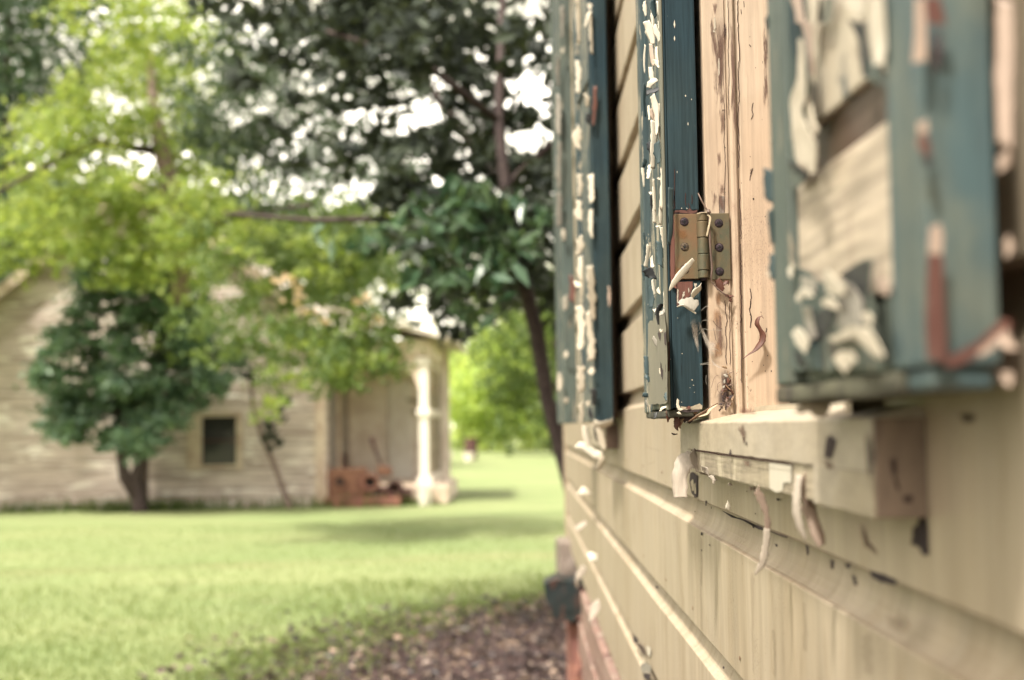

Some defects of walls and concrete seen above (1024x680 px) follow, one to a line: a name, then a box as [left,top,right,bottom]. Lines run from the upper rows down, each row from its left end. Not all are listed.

peeling [711,5,736,129]
peeling [787,0,886,189]
peeling [912,0,946,69]
peeling [994,0,1015,174]
peeling [555,0,613,470]
peeling [641,0,702,426]
peeling [753,168,890,375]
peeling [925,223,1020,367]
peeling [999,372,1014,388]
peeling [689,466,788,547]
peeling [769,463,792,501]
spalling [870,571,897,585]